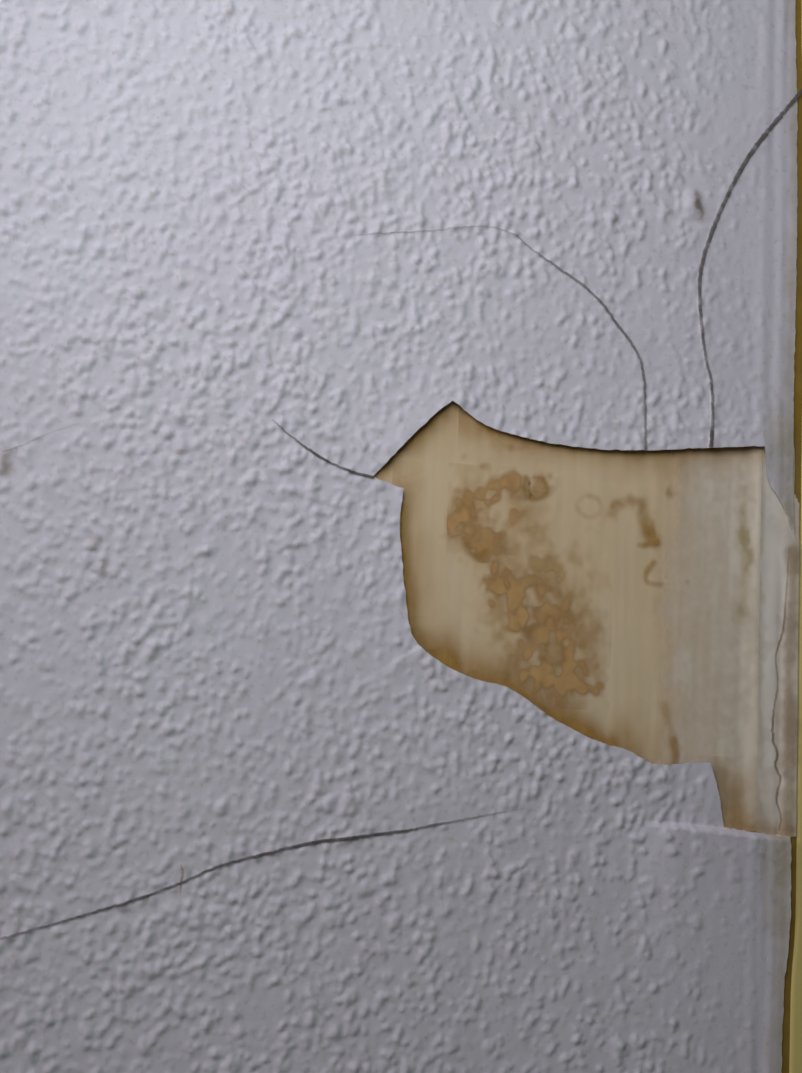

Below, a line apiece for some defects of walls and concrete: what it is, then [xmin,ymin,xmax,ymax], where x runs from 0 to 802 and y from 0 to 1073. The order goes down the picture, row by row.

crack [698,89,802,447]
crack [544,258,647,450]
crack [282,429,375,479]
damp [376,405,447,474]
damp [400,501,415,639]
damp [424,472,620,747]
peeling [374,401,799,839]
damp [644,525,659,546]
crack [13,820,456,936]